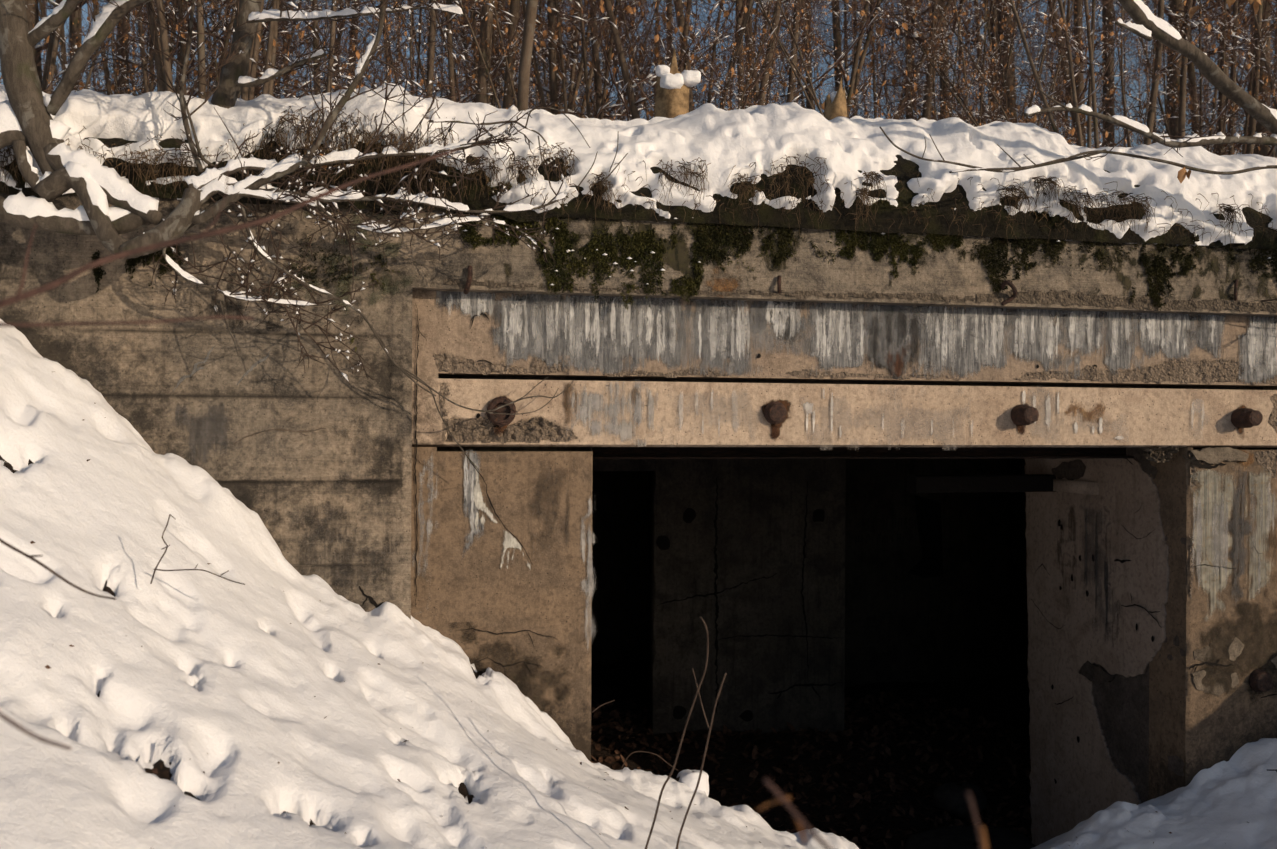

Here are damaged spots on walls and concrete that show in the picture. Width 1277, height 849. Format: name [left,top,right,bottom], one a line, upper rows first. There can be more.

water stain [197,209,411,331]
spalling [444,279,976,304]
water stain [1076,242,1277,301]
water stain [436,217,1225,447]
water stain [1238,316,1277,384]
water stain [176,403,227,462]
rust [761,399,791,439]
crack [657,478,843,713]
flaking render [1024,446,1249,846]